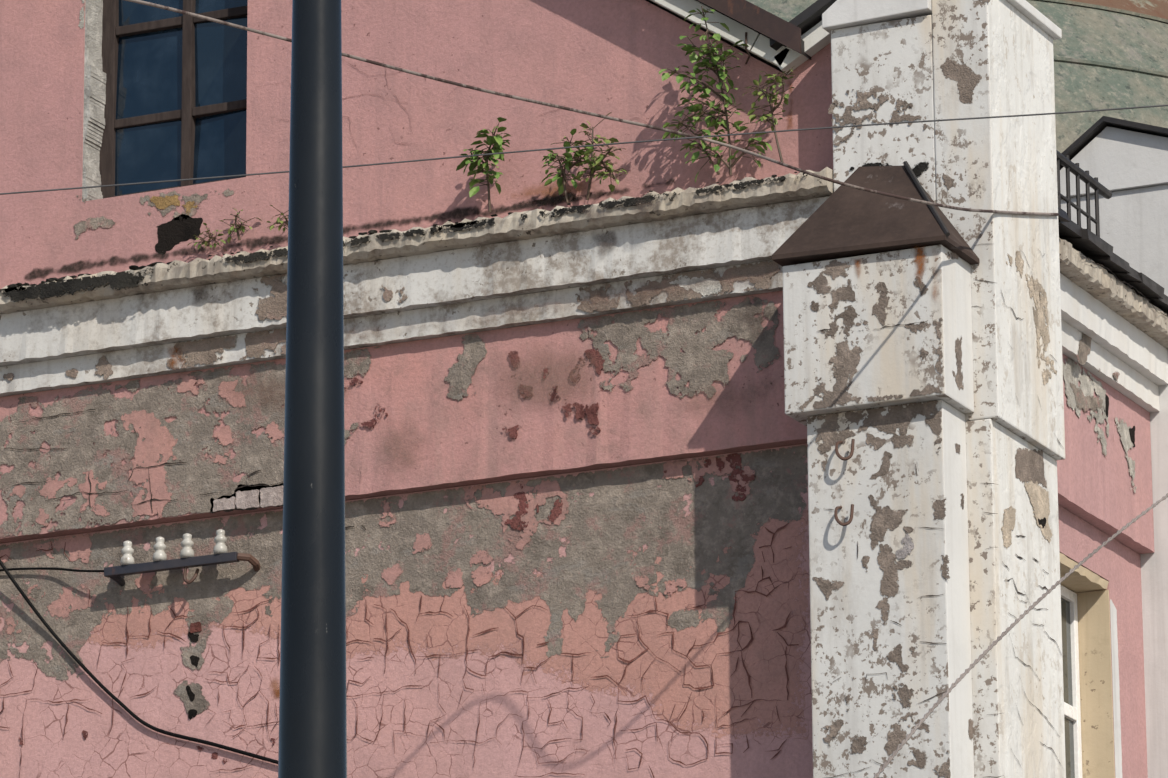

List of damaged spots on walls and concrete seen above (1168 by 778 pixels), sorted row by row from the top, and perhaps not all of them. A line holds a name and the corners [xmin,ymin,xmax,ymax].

spalling [139,188,234,253]
crack [0,538,71,561]
crack [10,409,96,450]
peeling [0,274,287,720]
crack [6,462,283,513]
peeling [344,259,964,658]
flaking render [1015,448,1052,543]
peeling [1006,250,1136,492]
crack [0,606,193,778]
crack [205,598,280,739]
crack [346,523,799,778]
peeling [862,495,950,778]